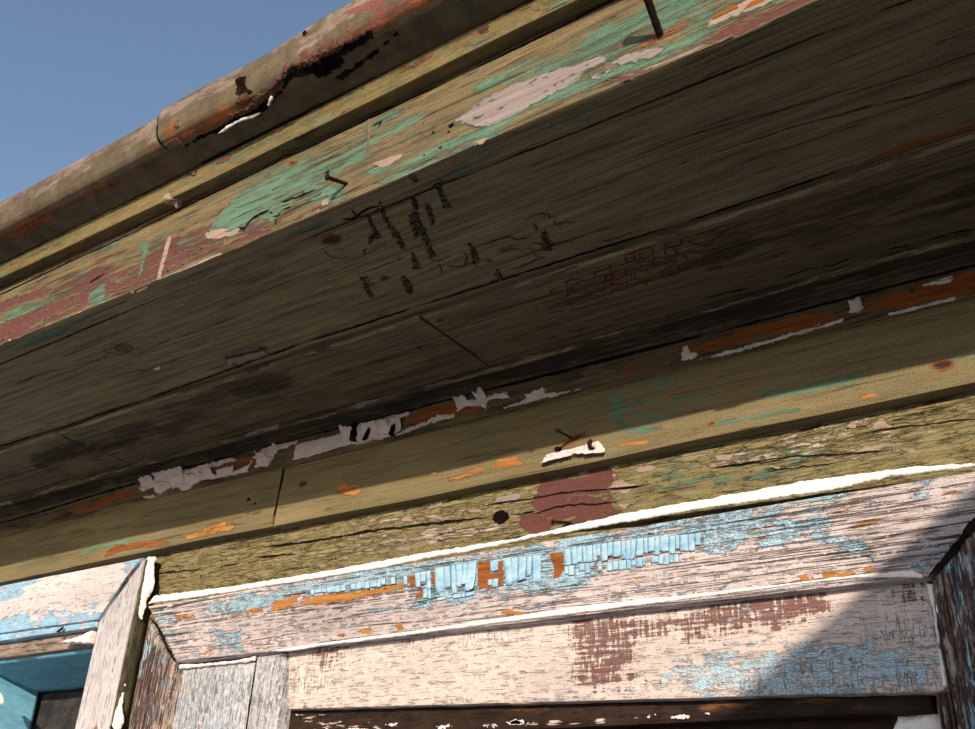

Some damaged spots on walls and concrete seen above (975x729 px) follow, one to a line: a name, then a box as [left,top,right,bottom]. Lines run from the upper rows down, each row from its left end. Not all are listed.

crack [0,0,614,295]
peeling [455,45,667,146]
crack [280,0,912,287]
crack [664,53,975,166]
peeling [105,179,343,295]
crack [0,168,839,447]
peeling [67,387,581,515]
crack [0,262,975,524]
peeling [460,464,635,534]
peeling [540,441,605,463]
rust [560,433,586,448]
peeling [244,532,701,614]